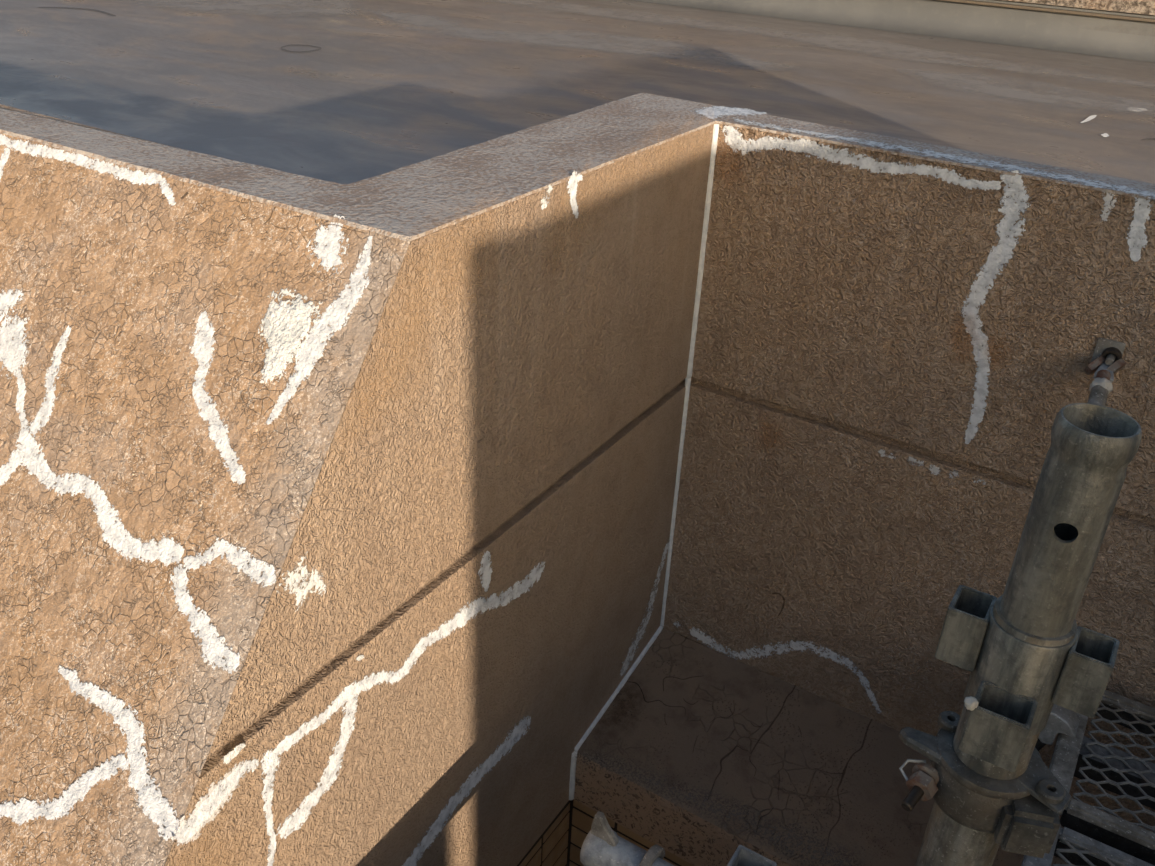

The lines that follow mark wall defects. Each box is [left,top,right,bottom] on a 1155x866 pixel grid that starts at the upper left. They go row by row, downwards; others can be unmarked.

crack [0,134,188,206]
crack [266,224,373,425]
crack [723,125,1032,444]
leakage [1100,191,1117,221]
leakage [1125,197,1153,262]
crack [0,289,276,674]
crack [0,562,545,866]
crack [620,539,882,859]